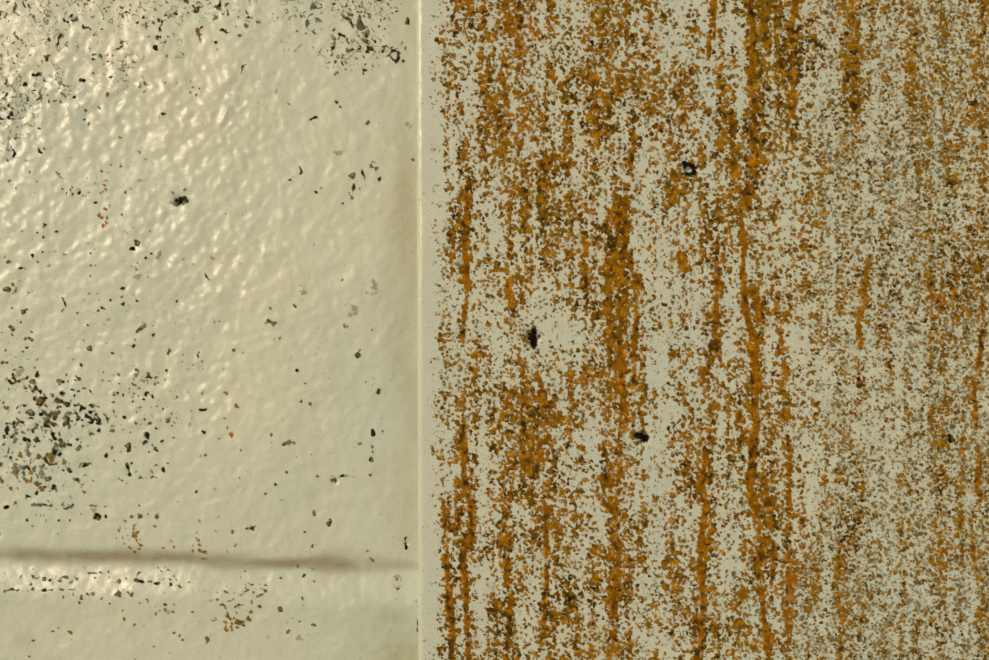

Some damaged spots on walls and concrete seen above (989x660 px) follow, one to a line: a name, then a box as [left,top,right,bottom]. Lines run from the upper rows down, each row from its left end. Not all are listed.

corrosion [429,0,989,660]